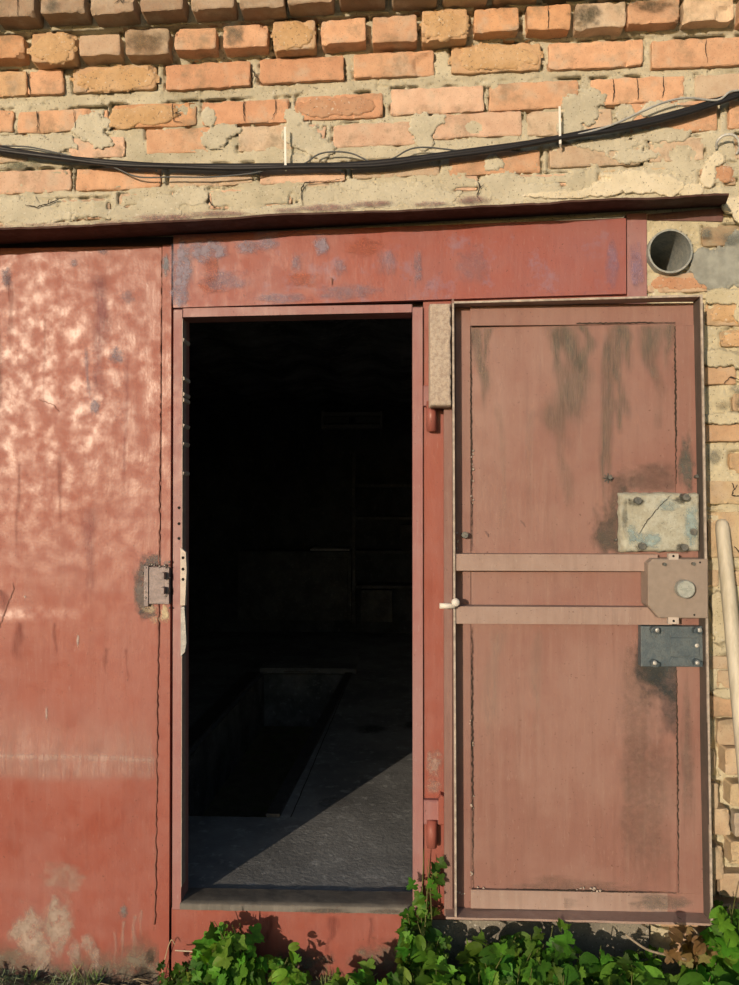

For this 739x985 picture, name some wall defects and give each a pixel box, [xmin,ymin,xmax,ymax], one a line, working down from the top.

spalling [524,151,734,199]
peeling [163,241,224,306]
spalling [651,276,707,290]